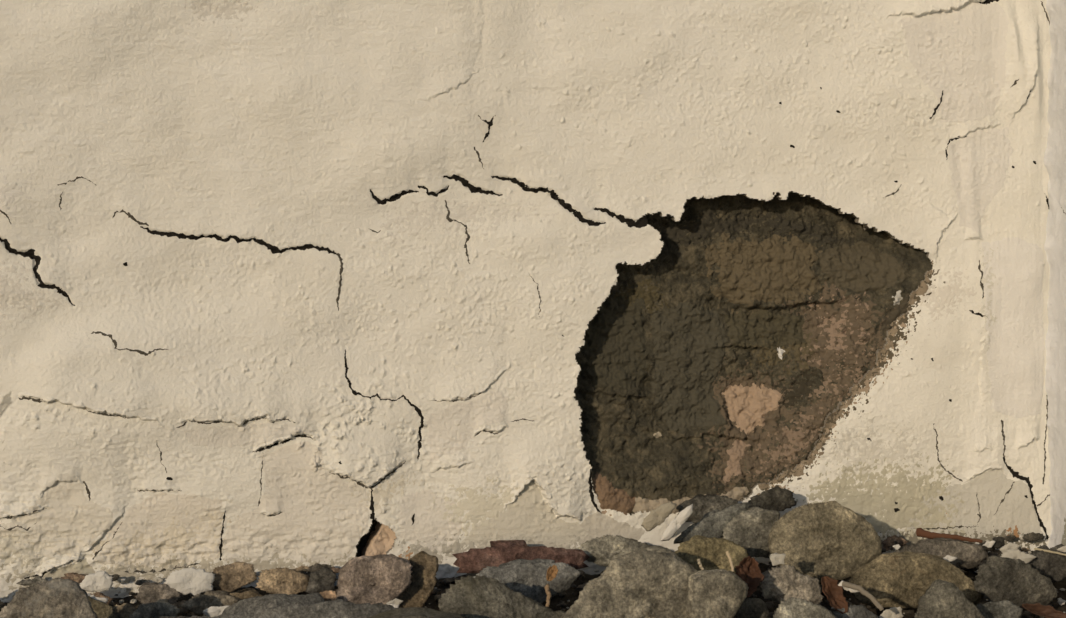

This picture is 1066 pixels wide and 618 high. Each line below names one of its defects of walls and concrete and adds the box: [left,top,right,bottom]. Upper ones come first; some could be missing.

peeling [423,71,478,101]
crack [370,115,649,264]
crack [0,210,75,306]
crack [113,209,343,311]
spalling [460,0,1044,548]
peeling [13,392,166,427]
crack [91,331,168,356]
peeling [0,410,462,578]
crack [329,349,490,520]
peeling [428,361,511,402]
crack [913,395,1050,539]